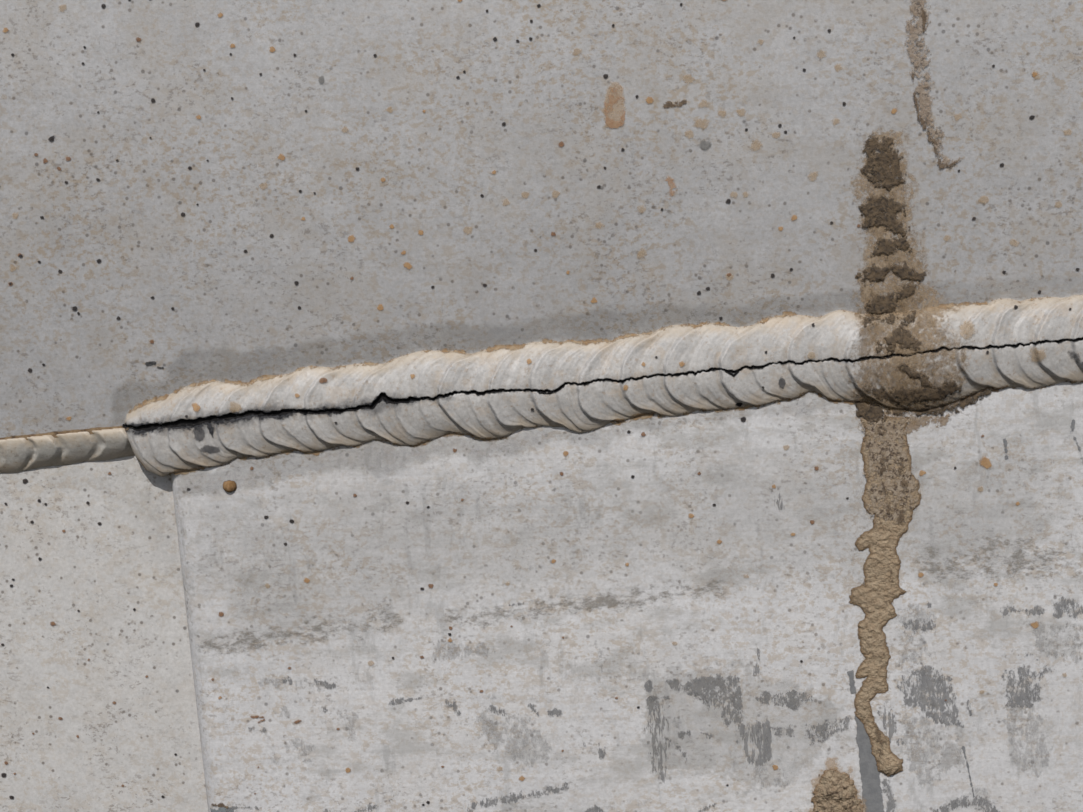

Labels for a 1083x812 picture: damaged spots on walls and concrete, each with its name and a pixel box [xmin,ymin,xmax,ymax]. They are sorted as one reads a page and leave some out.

crack [123,338,1083,436]